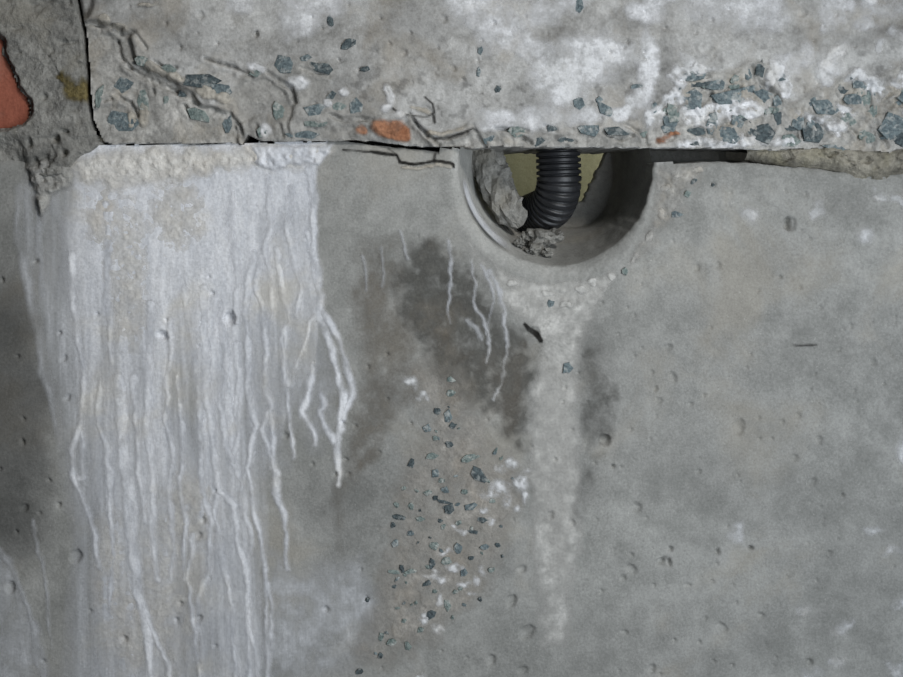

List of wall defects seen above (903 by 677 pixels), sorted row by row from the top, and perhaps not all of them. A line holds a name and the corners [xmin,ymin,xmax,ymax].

crack [343,97,479,170]
spalling [400,59,903,153]
water stain [21,141,374,677]
water stain [364,240,605,641]